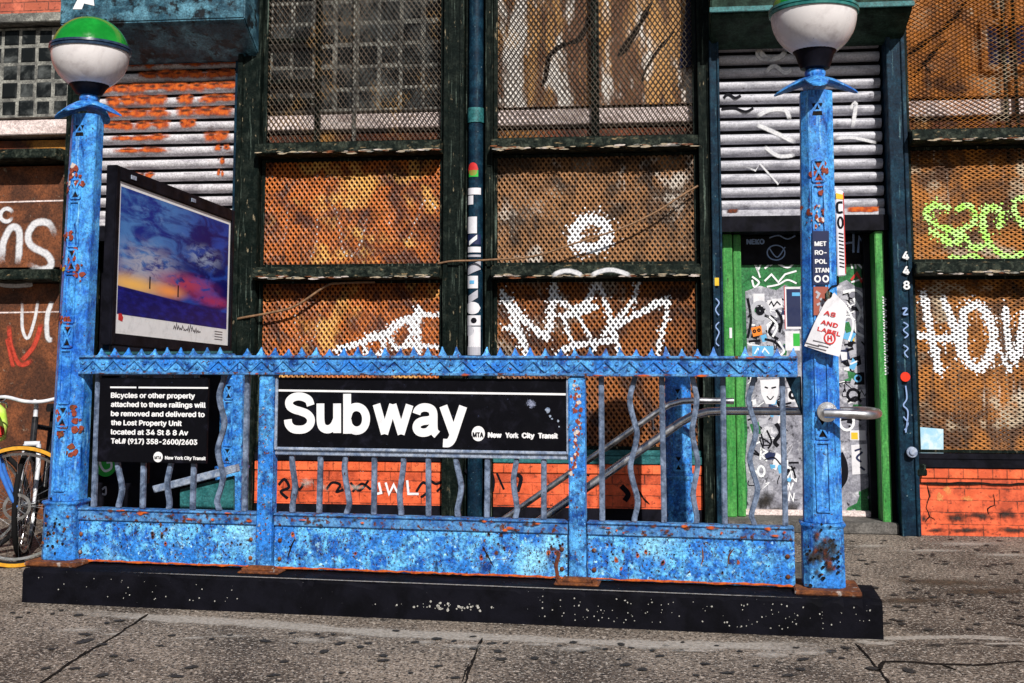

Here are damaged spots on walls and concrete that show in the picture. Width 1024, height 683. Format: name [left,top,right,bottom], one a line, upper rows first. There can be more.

rust [104,62,236,152]
rust [204,131,230,176]
rust [88,509,252,567]
rust [808,531,839,574]
crack [40,614,148,683]
crack [855,643,1024,683]